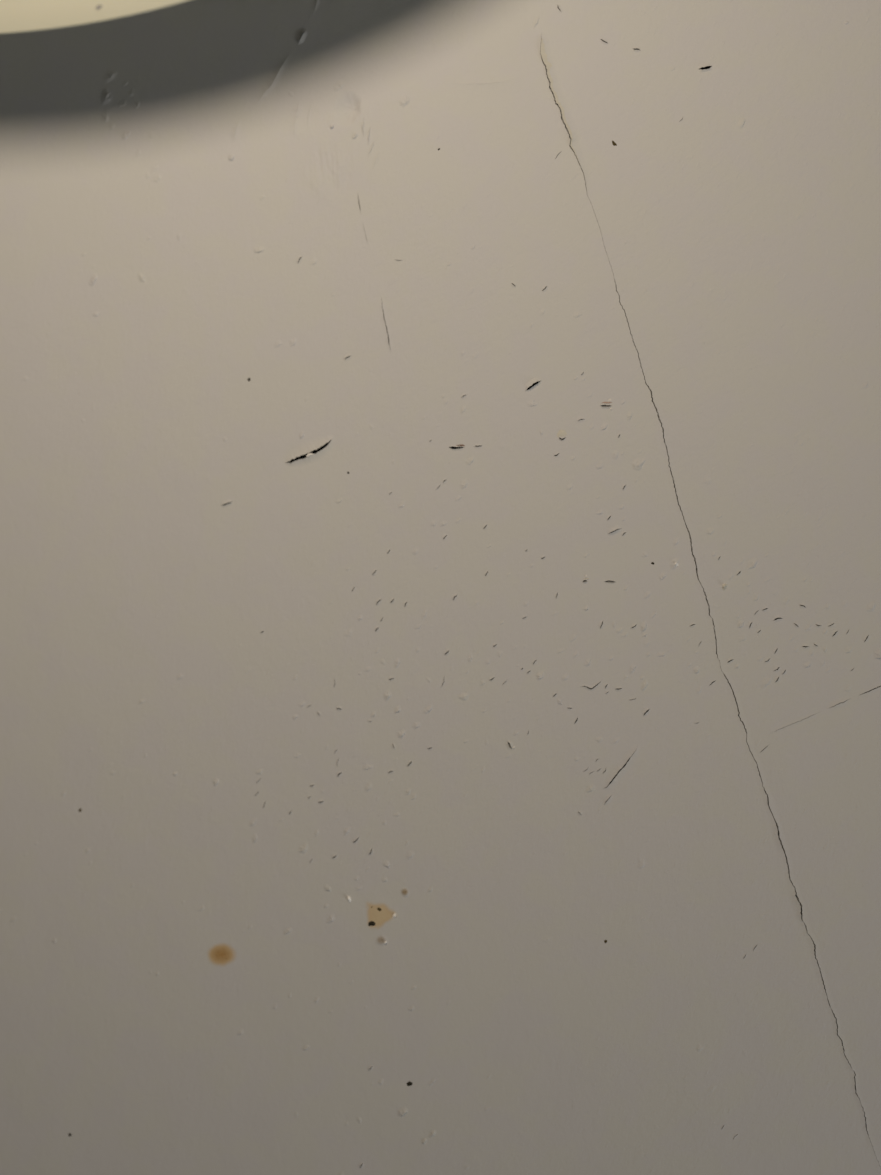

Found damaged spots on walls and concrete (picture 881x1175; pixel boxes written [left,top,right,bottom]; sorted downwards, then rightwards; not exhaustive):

rust [195,934,246,976]
crack [535,31,881,1175]